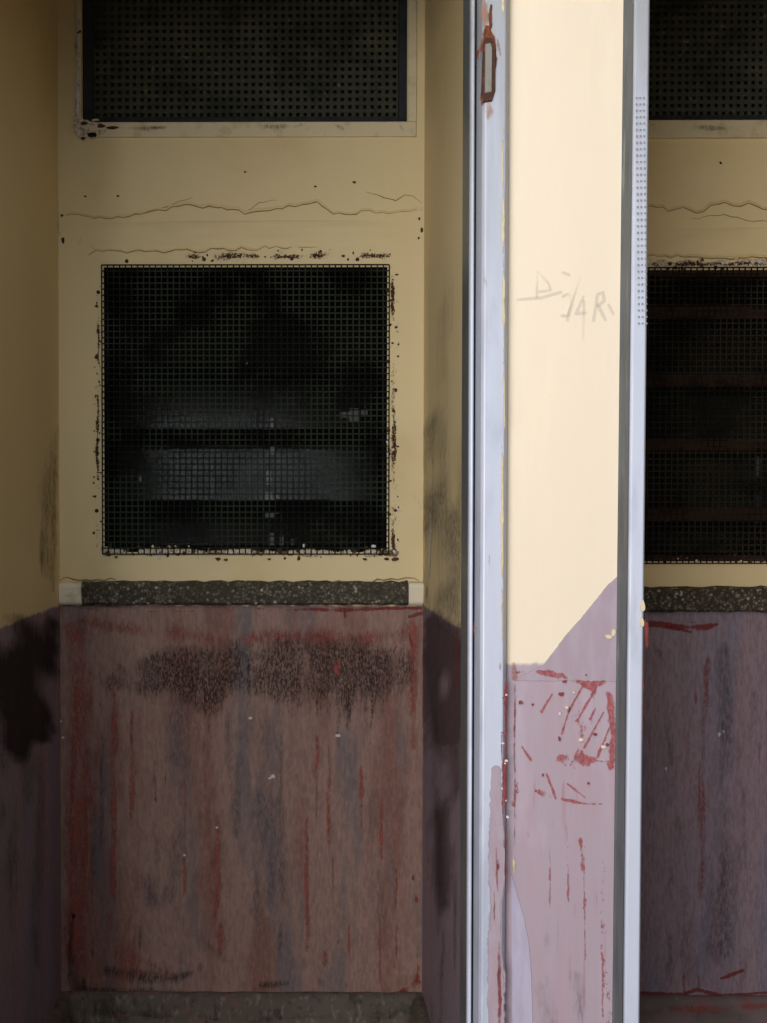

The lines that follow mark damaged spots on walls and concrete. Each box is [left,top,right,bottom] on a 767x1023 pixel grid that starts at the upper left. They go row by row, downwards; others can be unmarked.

rust [476,4,497,68]
flaking render [74,67,119,140]
crack [66,192,420,219]
crack [648,200,767,222]
crack [88,244,316,256]
crack [647,252,767,260]
damp [139,607,423,717]